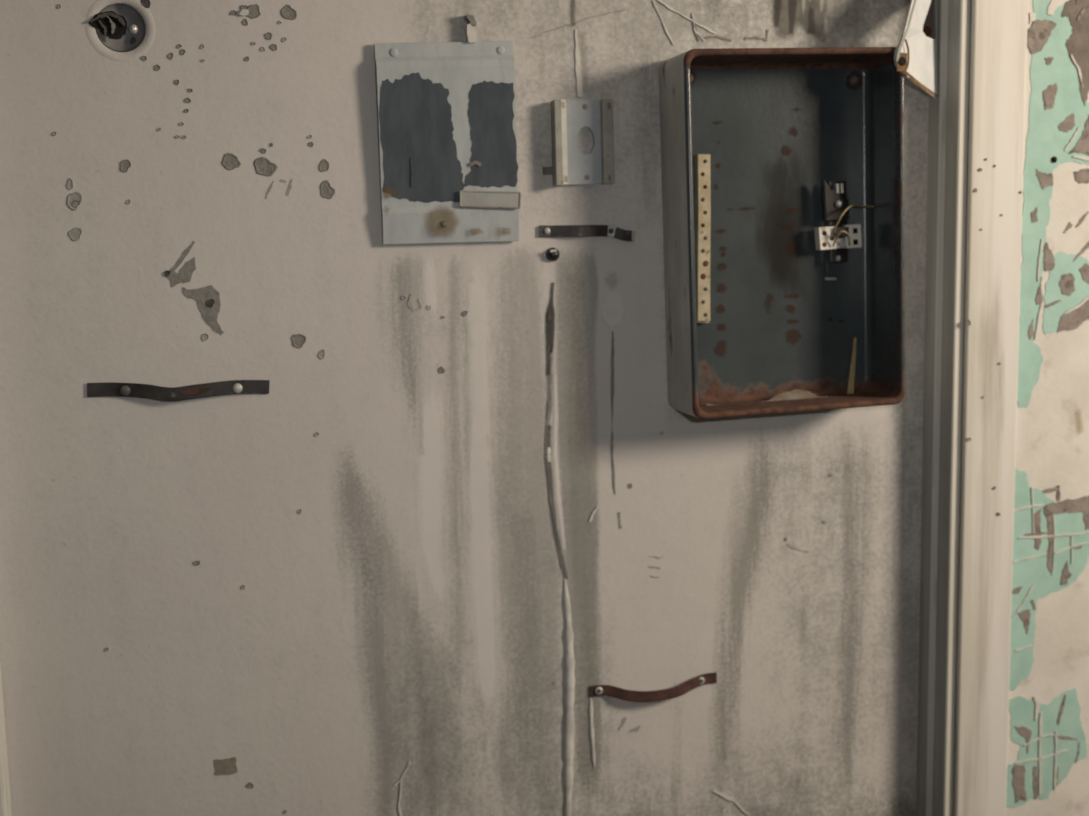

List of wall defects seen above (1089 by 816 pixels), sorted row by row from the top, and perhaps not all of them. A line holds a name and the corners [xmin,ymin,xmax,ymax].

spalling [141,44,185,71]
spalling [230,4,261,26]
spalling [244,4,297,61]
spalling [174,80,193,139]
spalling [67,178,82,211]
spalling [120,159,131,173]
spalling [221,143,293,199]
spalling [319,159,335,199]
peeling [1017,0,1089,408]
spalling [164,241,224,341]
spalling [291,334,306,348]
peeling [1006,468,1089,808]